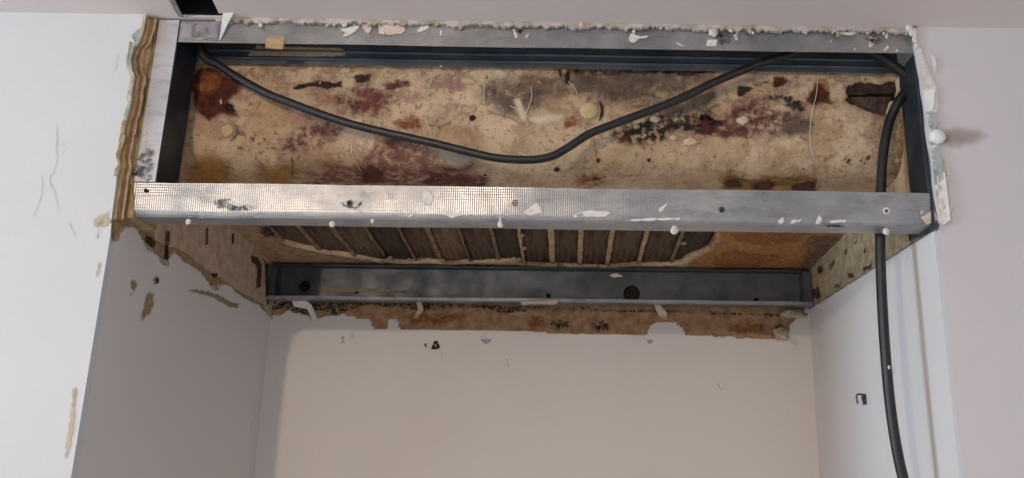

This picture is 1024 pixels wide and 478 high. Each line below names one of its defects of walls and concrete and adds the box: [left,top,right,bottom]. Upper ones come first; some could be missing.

peeling [127,29,141,61]
leakage [337,88,386,114]
mould [644,91,809,138]
leakage [188,157,231,183]
leakage [230,121,340,184]
leakage [313,138,487,187]
peeling [937,161,952,225]
peeling [65,389,77,458]